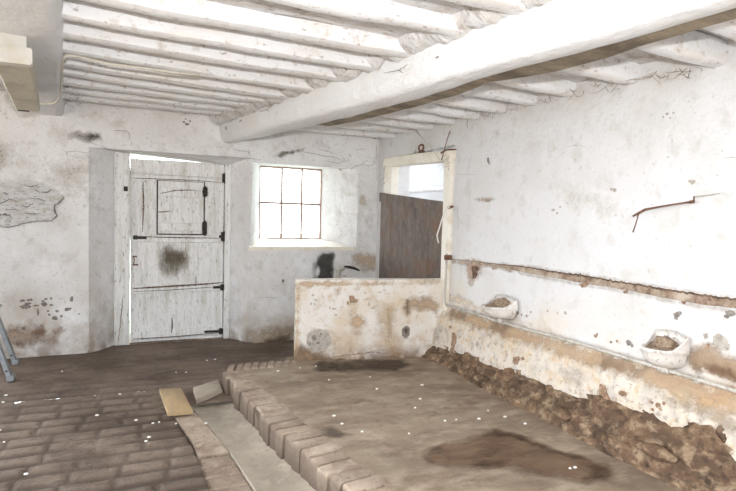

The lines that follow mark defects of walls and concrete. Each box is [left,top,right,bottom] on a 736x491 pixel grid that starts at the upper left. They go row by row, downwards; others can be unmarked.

peeling [0,180,64,228]
peeling [19,296,80,320]
spalling [454,259,736,320]
spalling [307,329,331,352]
spalling [422,325,736,491]